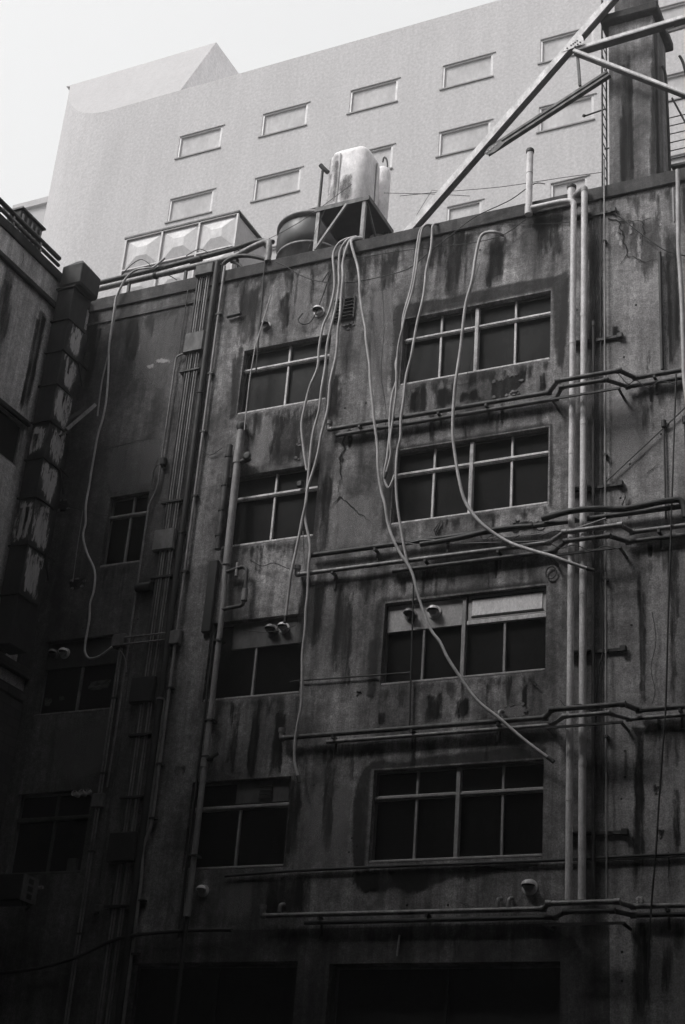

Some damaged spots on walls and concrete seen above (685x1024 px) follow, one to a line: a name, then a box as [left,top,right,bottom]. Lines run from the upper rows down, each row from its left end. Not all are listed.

damp [446,230,468,296]
damp [486,237,505,288]
crack [608,216,664,263]
damp [0,271,12,338]
damp [20,312,46,408]
damp [252,379,340,465]
damp [410,384,481,412]
crack [334,436,373,525]
damp [637,575,645,697]
damp [456,698,469,717]
damp [271,713,285,770]
damp [632,735,645,875]